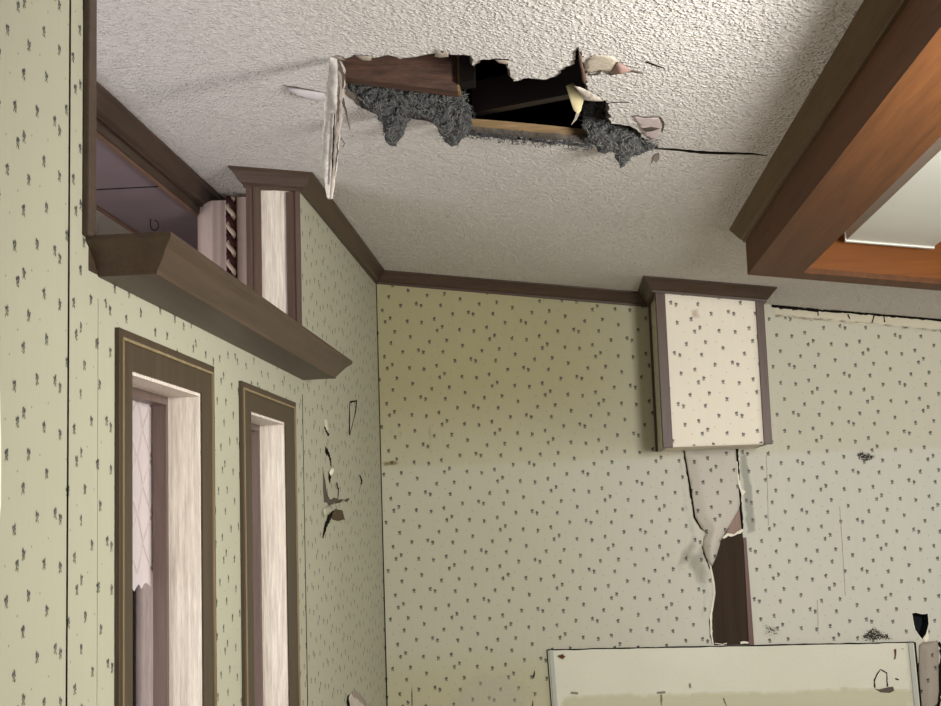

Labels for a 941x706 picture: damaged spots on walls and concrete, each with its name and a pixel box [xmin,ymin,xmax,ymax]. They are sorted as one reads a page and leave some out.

peeling [585,55,644,76]
peeling [566,83,604,114]
peeling [631,115,665,140]
crack [654,148,767,156]
spalling [913,613,929,639]